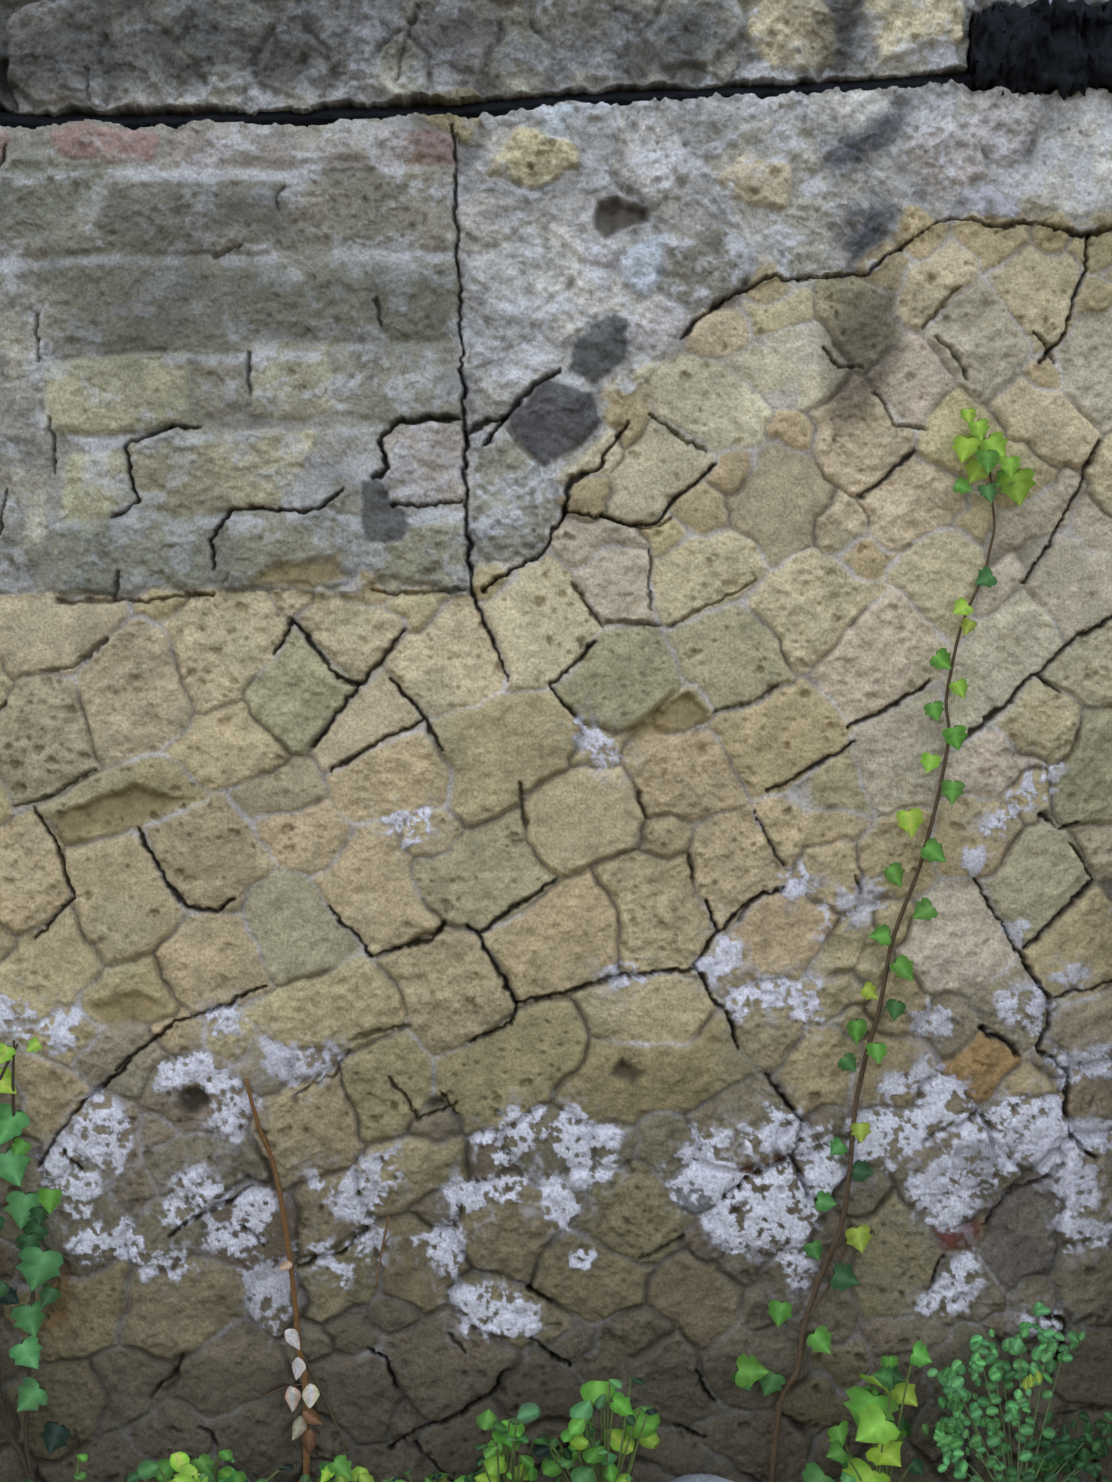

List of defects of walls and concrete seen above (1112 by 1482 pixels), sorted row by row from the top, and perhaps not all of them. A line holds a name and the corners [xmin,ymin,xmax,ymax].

efflorescence [0,994,84,1055]
efflorescence [153,1002,262,1144]
efflorescence [260,1035,345,1086]
efflorescence [600,961,646,989]
efflorescence [691,936,825,1027]
efflorescence [909,998,953,1036]
efflorescence [994,964,1088,1037]
efflorescence [663,1044,1112,1291]
efflorescence [36,1088,403,1332]
efflorescence [411,1104,625,1338]
efflorescence [915,1248,982,1316]
efflorescence [1021,1310,1063,1333]